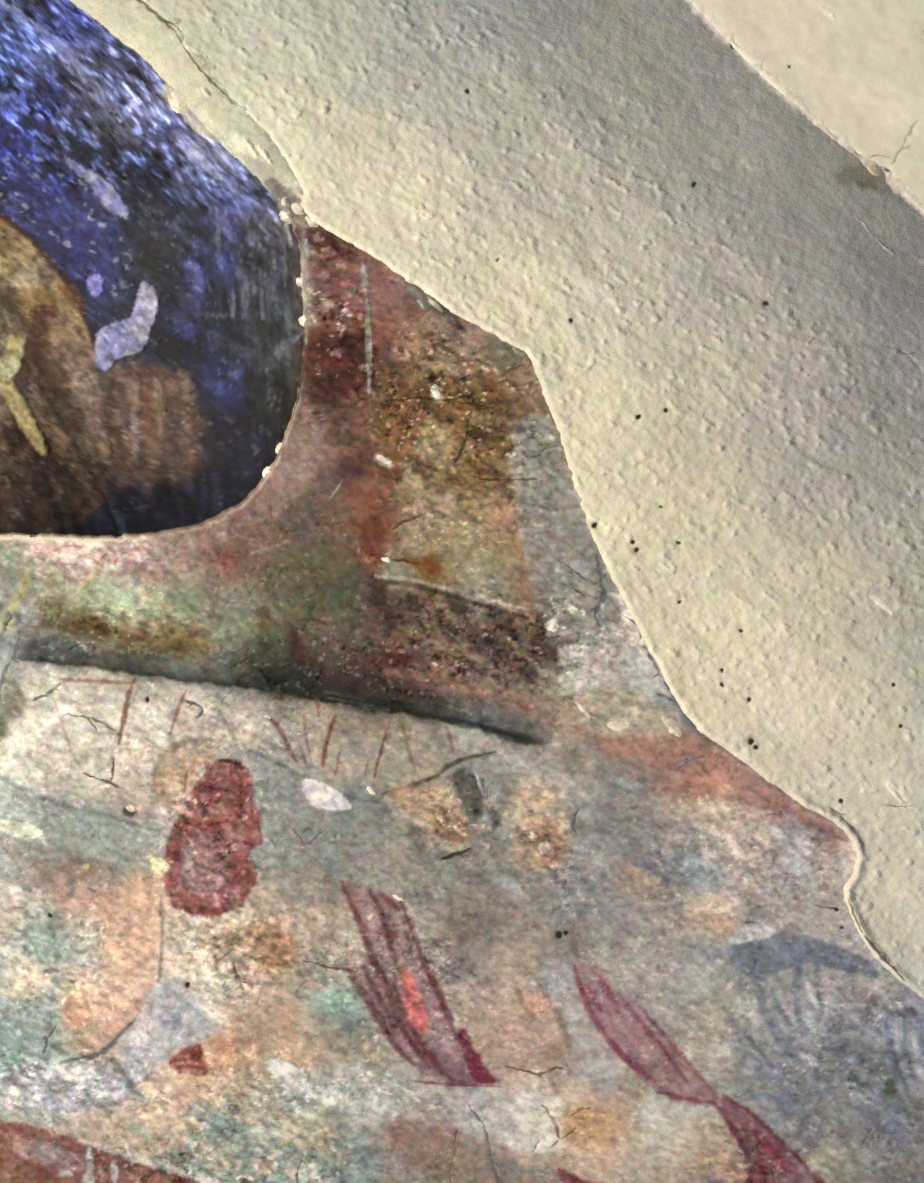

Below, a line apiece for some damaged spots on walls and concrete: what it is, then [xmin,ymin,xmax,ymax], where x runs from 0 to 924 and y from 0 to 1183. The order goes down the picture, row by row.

crack [137,0,232,103]
crack [827,901,905,981]